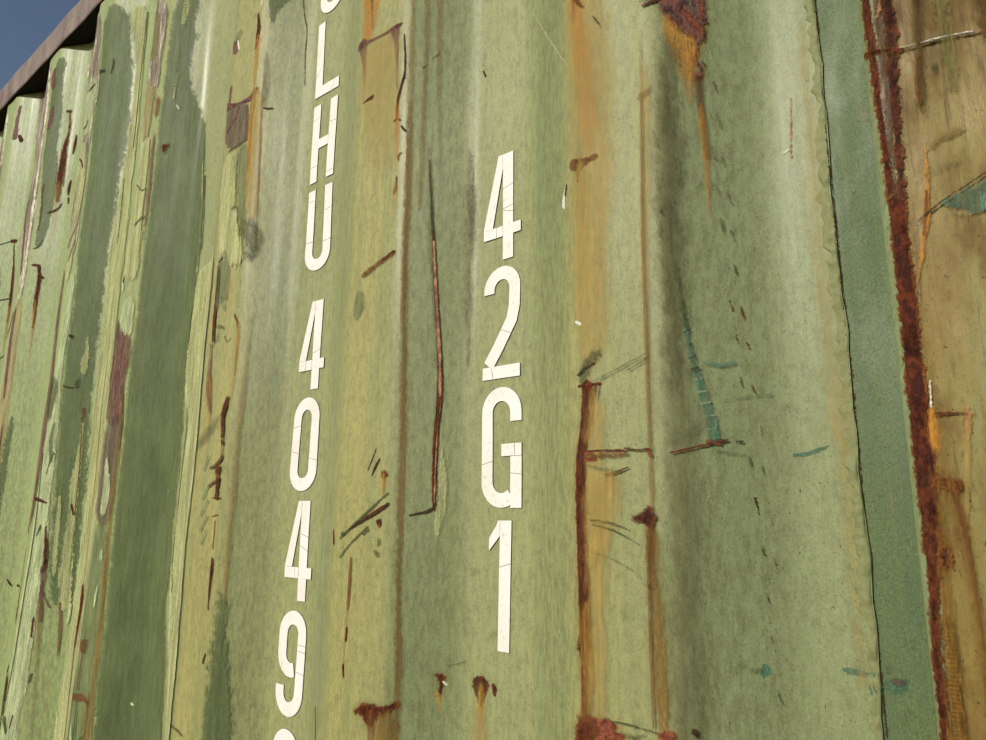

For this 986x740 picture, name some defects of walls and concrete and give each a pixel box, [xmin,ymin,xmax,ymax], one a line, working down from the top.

corrosion [358,0,403,67]
peeling [218,85,258,300]
corrosion [860,0,986,740]
corrosion [571,379,677,740]
corrosion [353,700,400,740]